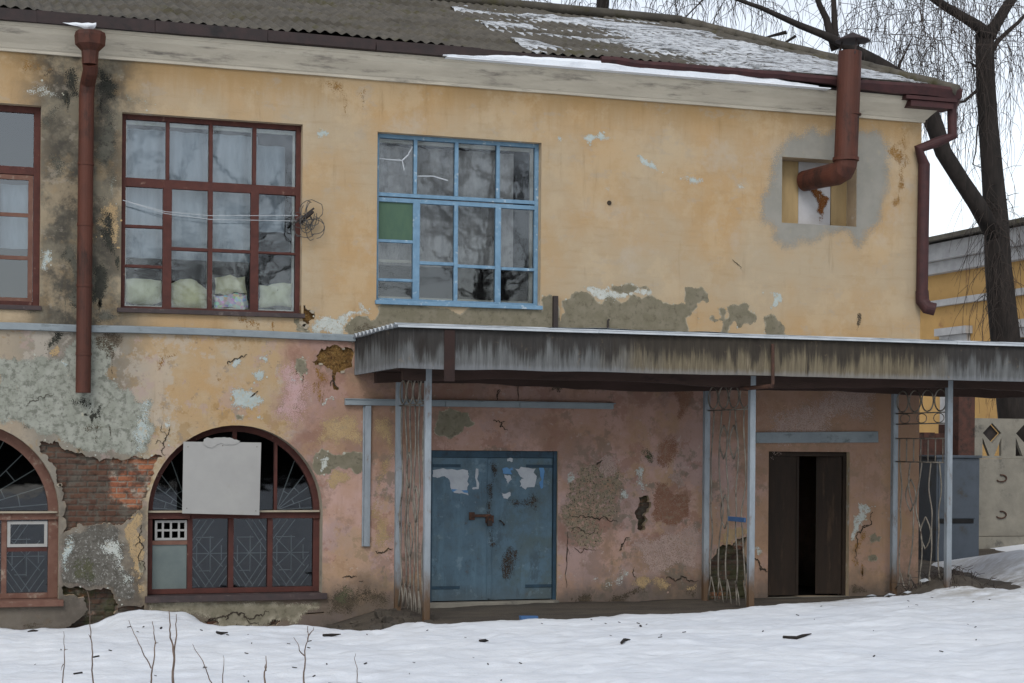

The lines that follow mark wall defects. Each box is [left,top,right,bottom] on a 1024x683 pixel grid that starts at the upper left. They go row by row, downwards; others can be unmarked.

water stain [22,58,79,129]
water stain [95,67,119,176]
corrosion [810,189,829,221]
corrosion [889,136,910,206]
water stain [92,197,123,378]
flaking render [291,283,786,405]
peeling [230,355,268,420]
flaking render [312,448,363,476]
spalling [39,417,331,628]
spalling [558,454,653,550]
peeling [851,503,881,562]